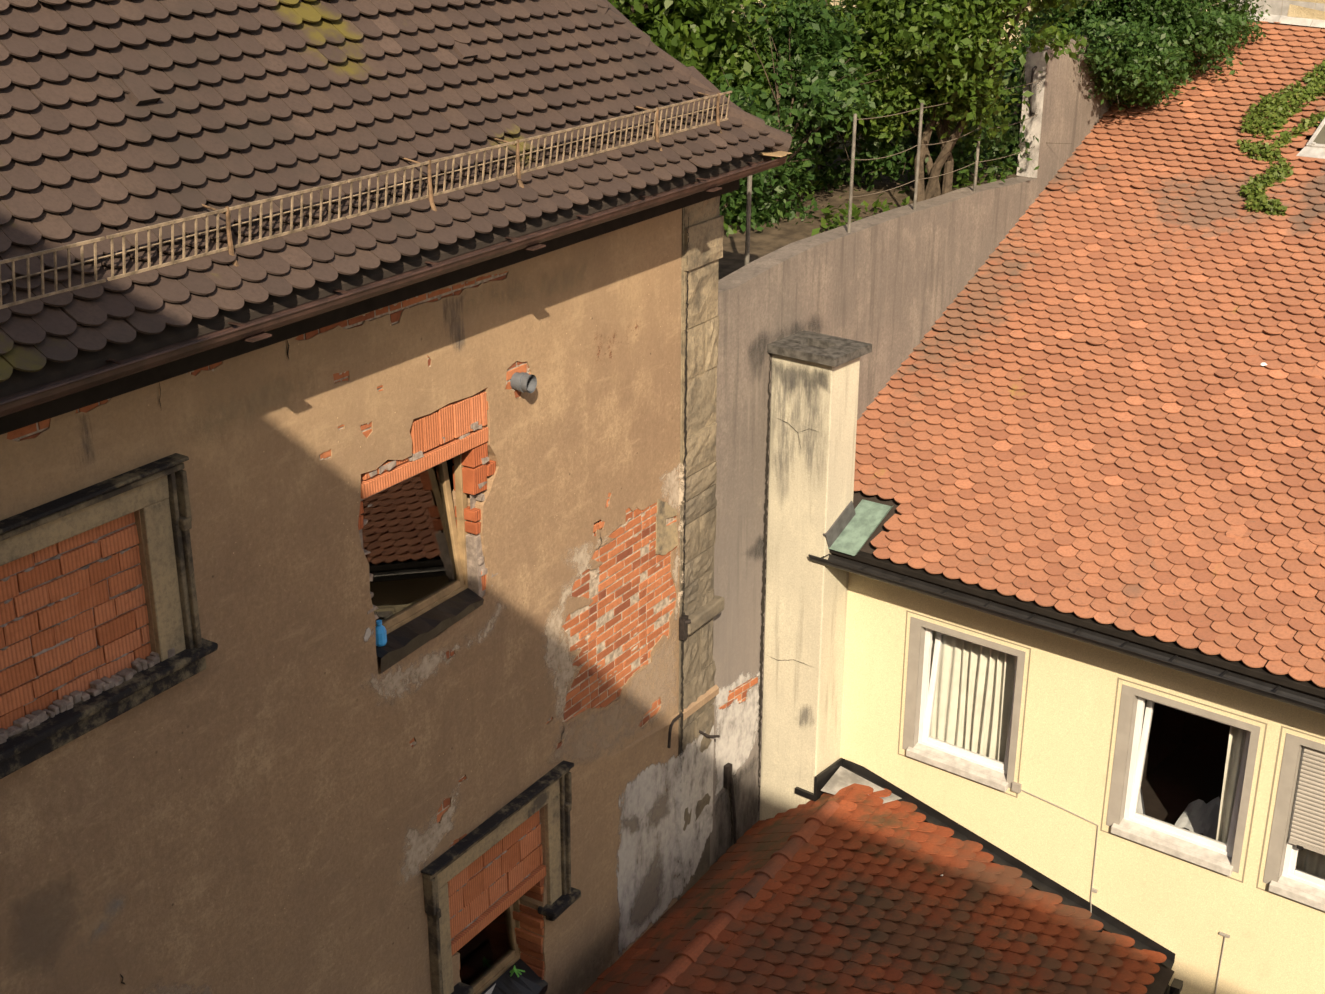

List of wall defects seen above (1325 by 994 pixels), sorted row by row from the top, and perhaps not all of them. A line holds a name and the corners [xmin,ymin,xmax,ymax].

flaking render [296,271,508,340]
water stain [784,371,827,400]
flaking render [7,419,50,441]
flaking render [546,493,680,725]